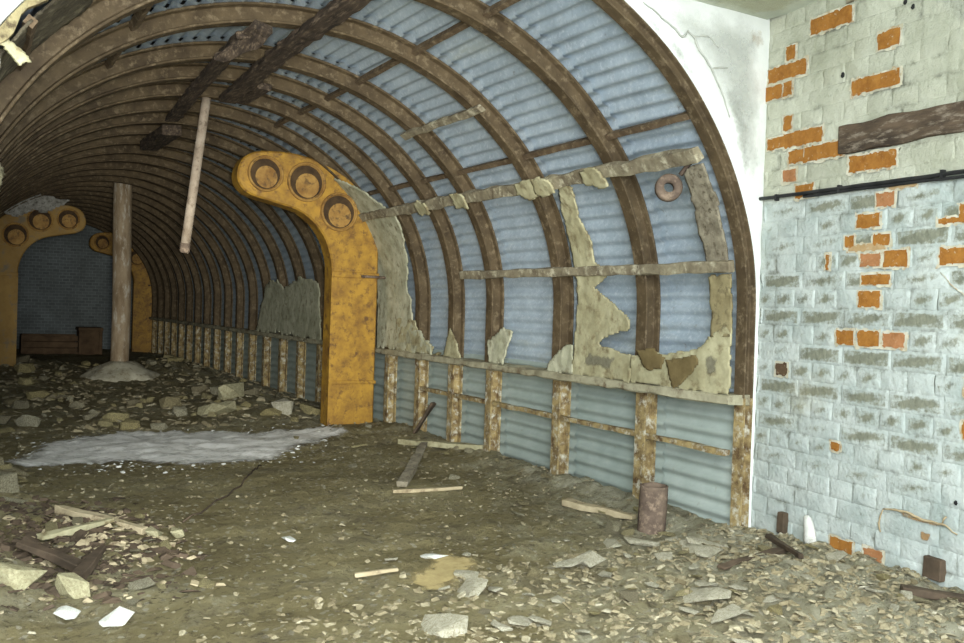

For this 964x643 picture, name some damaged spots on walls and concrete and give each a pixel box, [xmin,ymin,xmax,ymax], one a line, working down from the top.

peeling [809,4,855,37]
peeling [0,39,31,66]
peeling [876,23,903,53]
peeling [765,42,809,104]
peeling [841,66,903,99]
peeling [4,194,70,217]
peeling [935,202,964,228]
peeling [935,244,964,269]
peeling [487,327,513,365]
peeling [834,328,909,351]
peeling [635,348,698,388]
peeling [828,533,885,565]